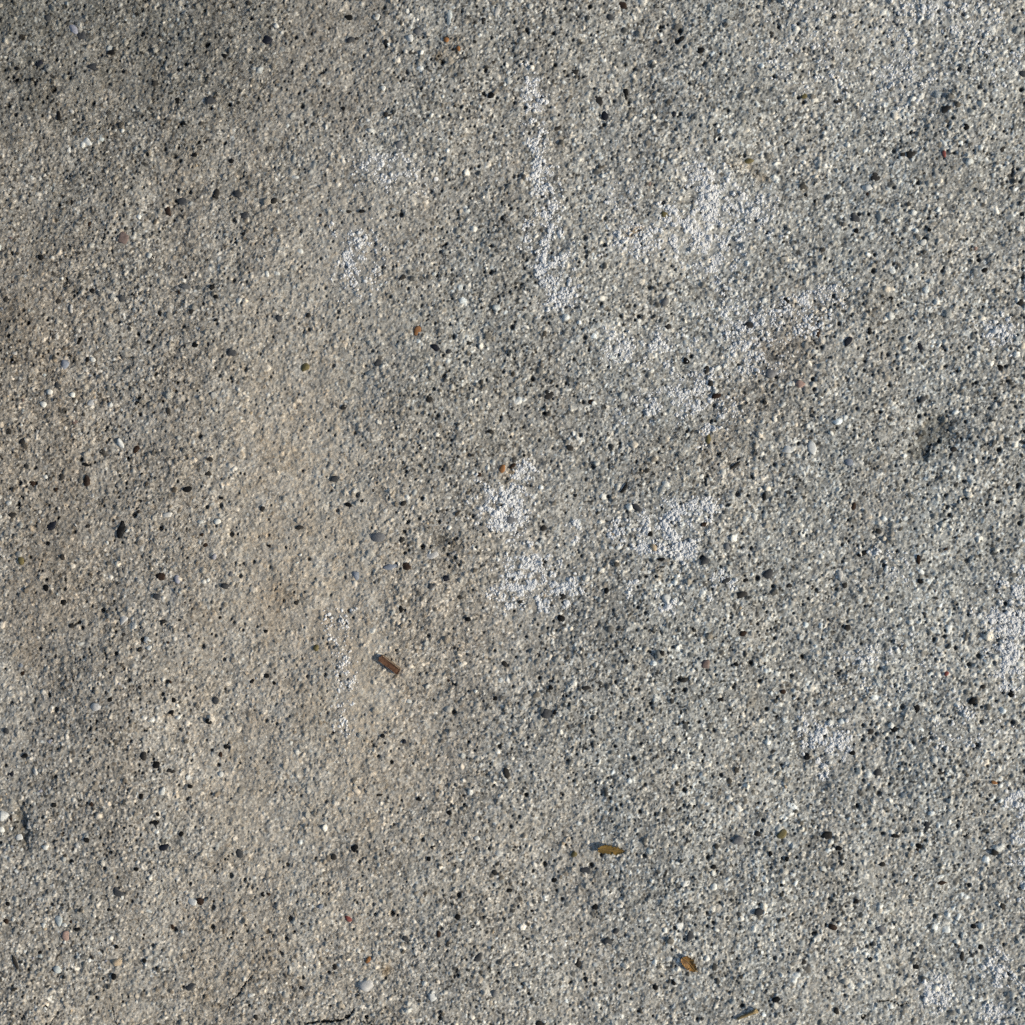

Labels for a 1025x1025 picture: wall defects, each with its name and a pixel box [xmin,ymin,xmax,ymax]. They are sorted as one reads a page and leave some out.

crack [307,1009,372,1025]